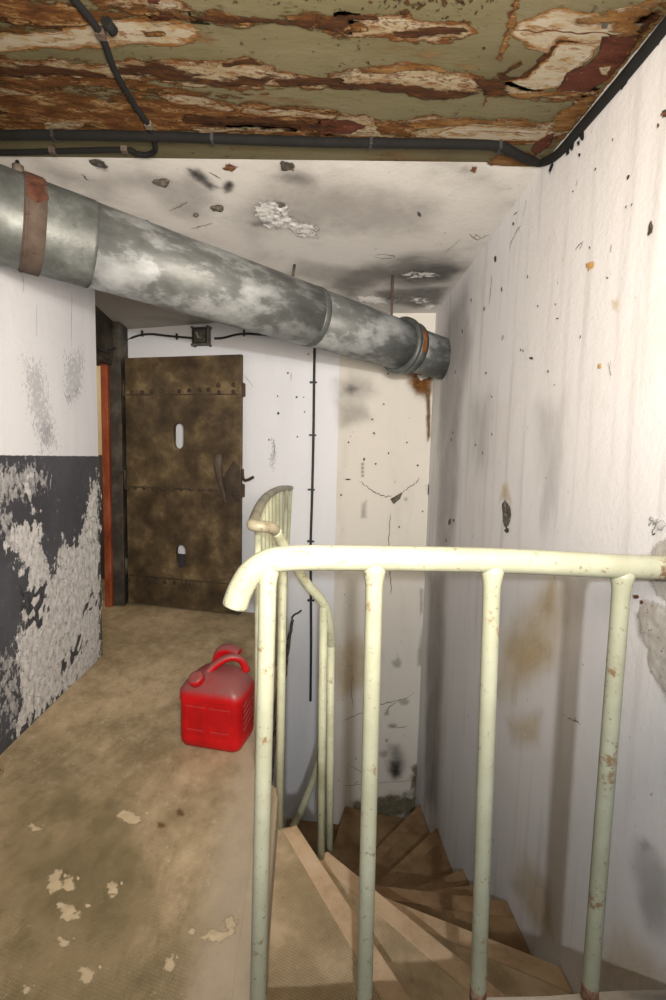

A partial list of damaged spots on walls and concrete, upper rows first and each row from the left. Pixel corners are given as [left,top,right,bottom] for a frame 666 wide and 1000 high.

peeling [0,0,662,155]
peeling [253,200,320,239]
damp [356,295,396,304]
corrosion [409,373,432,442]
crack [346,478,419,542]
peeling [649,516,666,555]
peeling [0,457,103,742]
peeling [634,580,666,691]